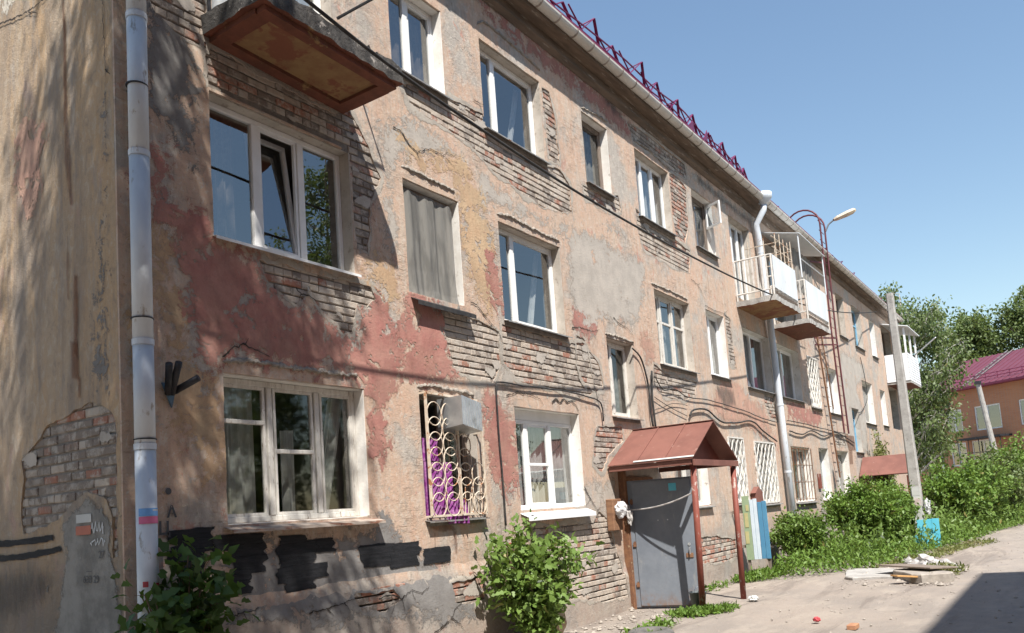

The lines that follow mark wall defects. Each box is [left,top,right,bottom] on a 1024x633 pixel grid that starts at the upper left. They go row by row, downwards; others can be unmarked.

peeling [146,0,753,505]
flaking render [21,216,127,557]
crack [222,338,268,357]
flaking render [224,510,492,631]
flaking render [701,534,737,567]